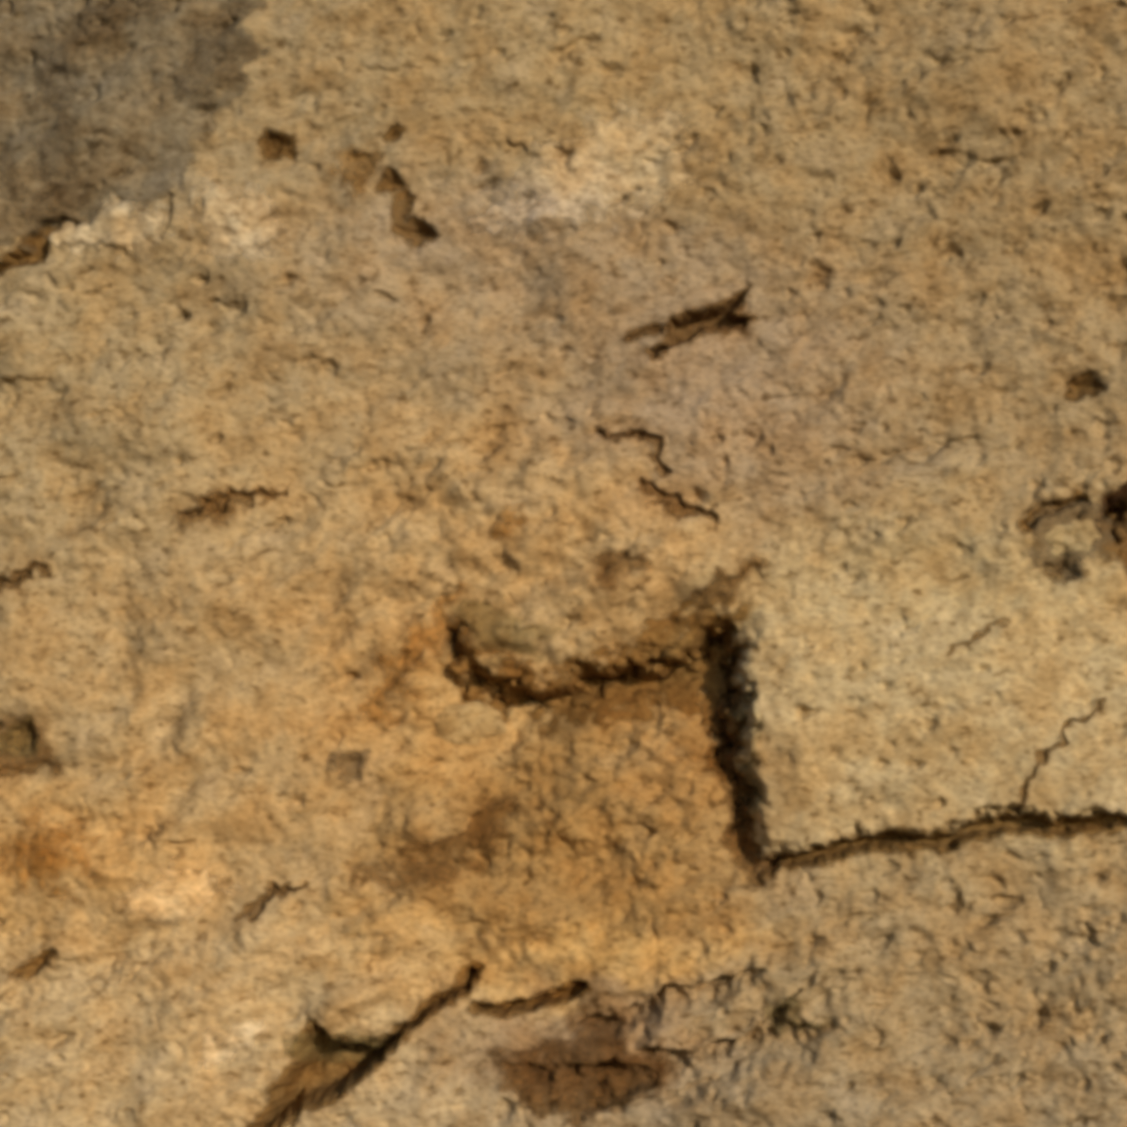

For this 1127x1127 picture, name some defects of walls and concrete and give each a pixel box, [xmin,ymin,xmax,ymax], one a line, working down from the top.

water stain [0,0,284,262]
crack [946,618,1009,655]
spalling [318,650,761,950]
crack [712,656,1127,886]
crack [247,960,592,1127]